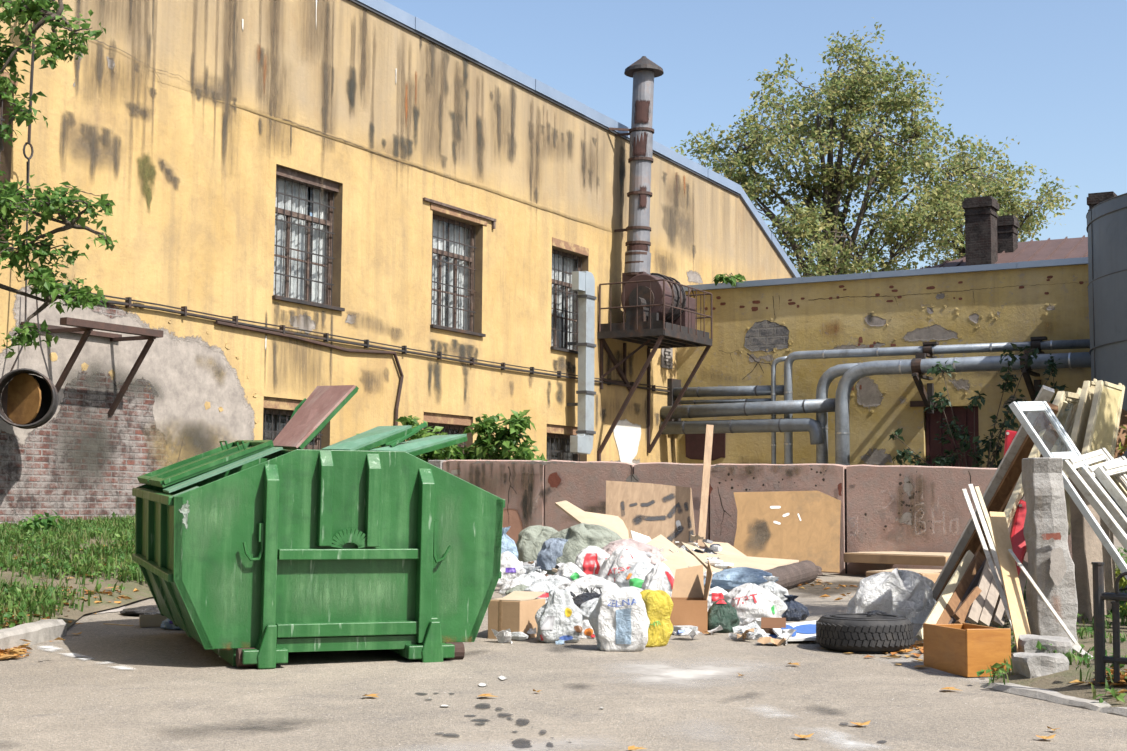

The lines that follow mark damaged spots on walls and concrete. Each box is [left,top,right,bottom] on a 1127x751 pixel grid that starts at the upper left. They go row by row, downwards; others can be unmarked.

damp [191,0,244,152]
damp [310,0,334,133]
damp [348,9,484,167]
damp [60,113,118,173]
damp [490,90,515,156]
corrosion [631,100,650,157]
damp [138,157,177,209]
corrosion [639,186,647,208]
corrosion [628,243,648,251]
flaking render [829,281,1001,350]
flaking render [0,269,259,526]
damp [446,462,542,519]